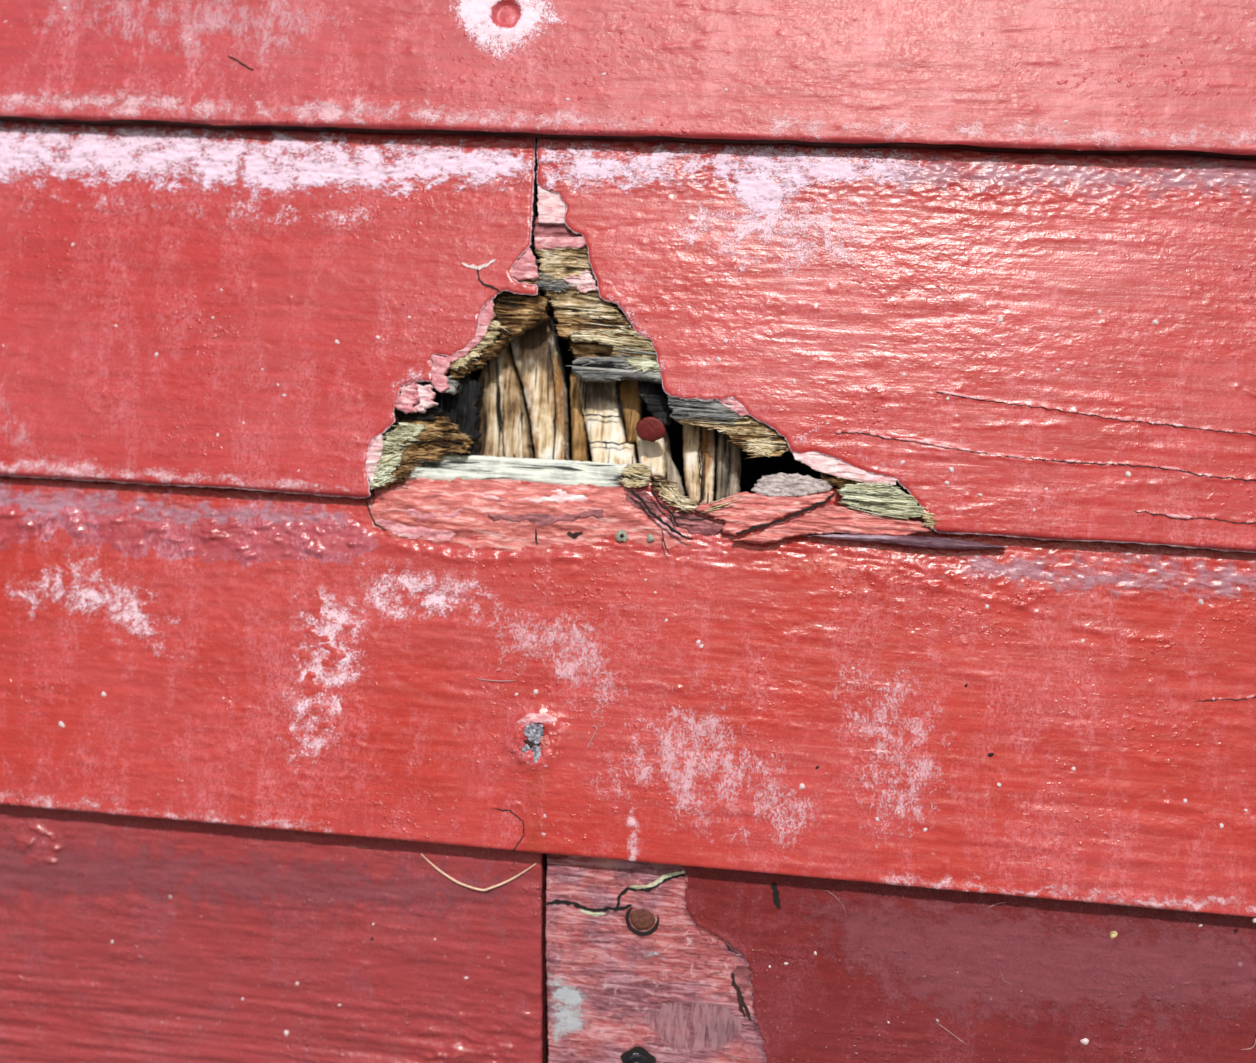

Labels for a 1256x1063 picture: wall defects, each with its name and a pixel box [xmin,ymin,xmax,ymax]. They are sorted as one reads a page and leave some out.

peeling [509,186,586,282]
peeling [564,270,599,294]
peeling [394,300,496,414]
peeling [720,397,747,416]
crack [936,390,1256,436]
peeling [786,444,897,485]
crack [834,429,1256,482]
peeling [365,434,724,553]
crack [1134,511,1256,524]
peeling [546,856,767,1063]